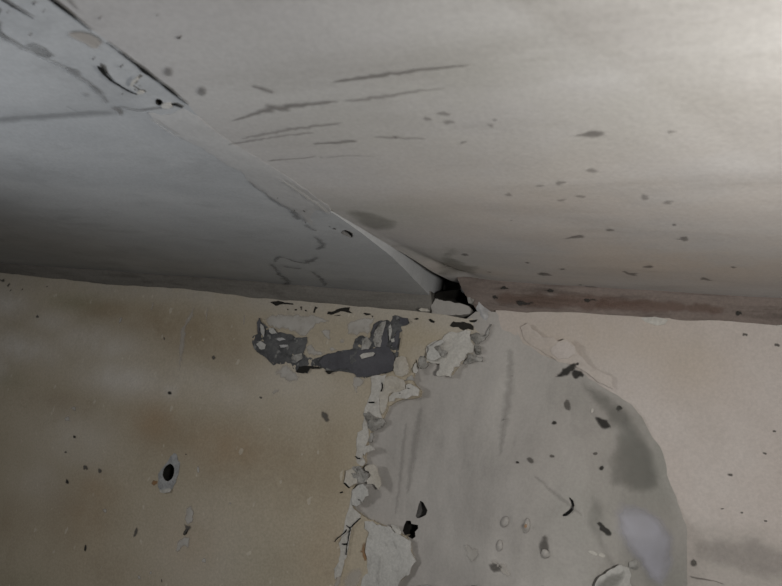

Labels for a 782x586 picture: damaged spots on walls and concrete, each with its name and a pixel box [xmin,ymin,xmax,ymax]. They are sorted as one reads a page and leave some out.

crack [2,0,34,19]
crack [49,0,92,32]
crack [107,43,188,108]
spalling [252,315,474,586]